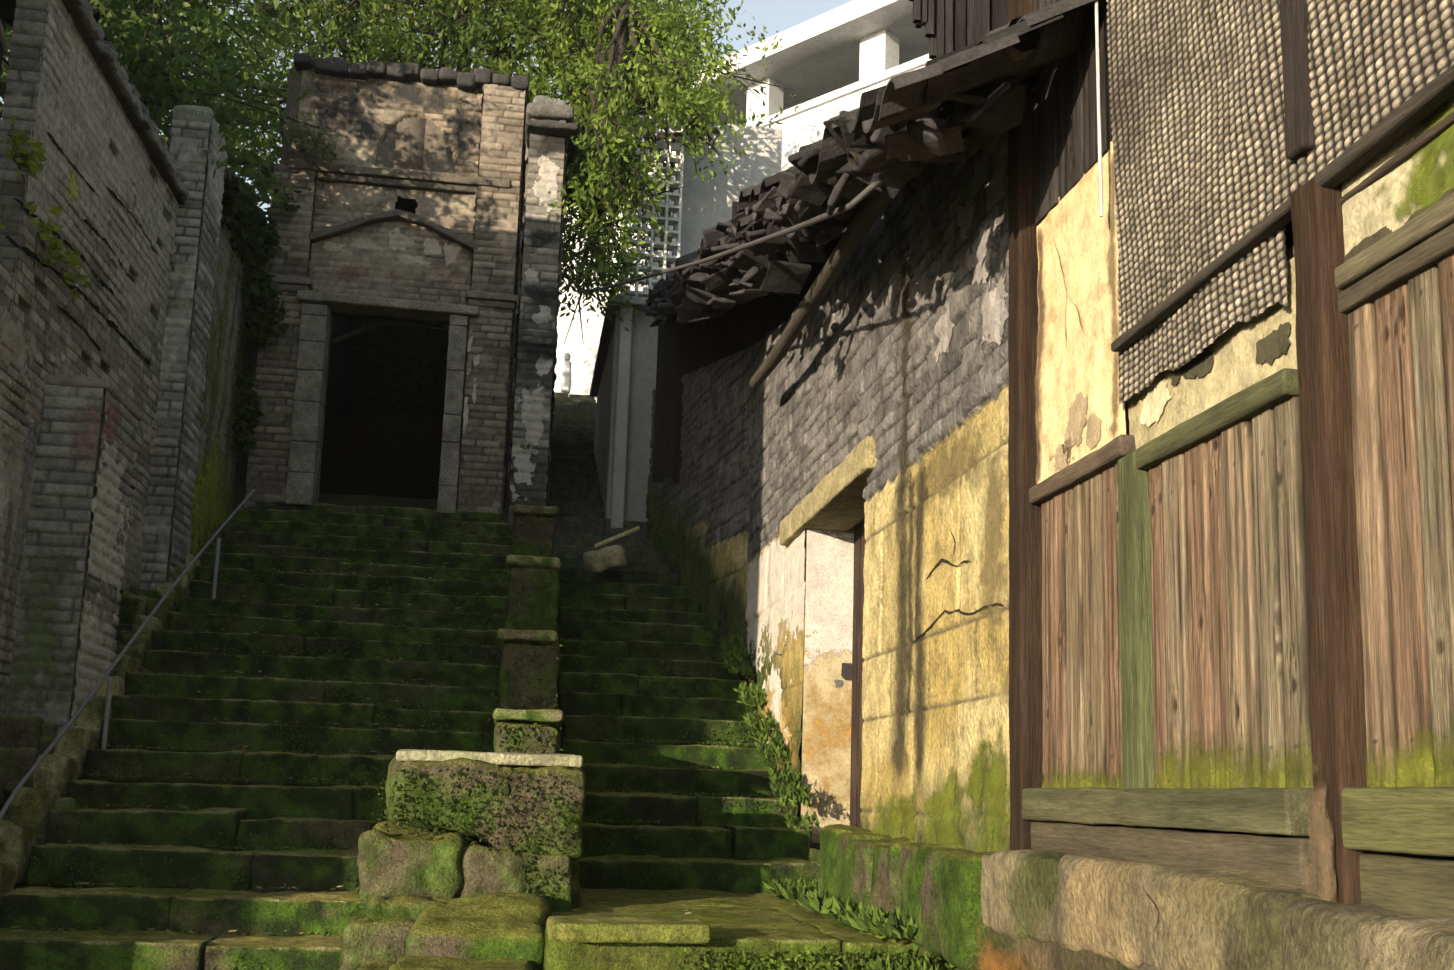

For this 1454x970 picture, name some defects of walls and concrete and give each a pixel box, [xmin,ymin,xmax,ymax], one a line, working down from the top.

spalling [532,154,560,215]
peeling [1344,188,1454,262]
spalling [531,305,551,325]
peeling [1250,305,1291,365]
leakage [197,254,255,505]
peeling [1133,347,1213,427]
spalling [0,302,75,566]
spalling [510,356,553,502]
crack [925,529,971,579]
leakage [891,258,1007,776]
crack [914,603,1002,644]
corrosion [979,944,1021,970]